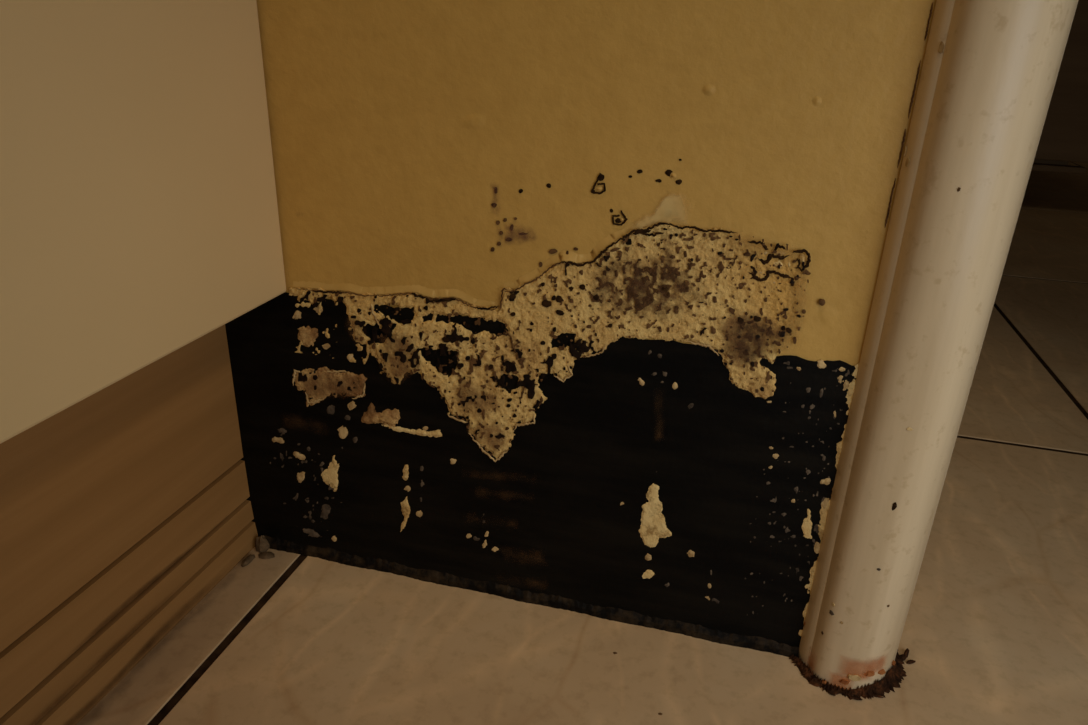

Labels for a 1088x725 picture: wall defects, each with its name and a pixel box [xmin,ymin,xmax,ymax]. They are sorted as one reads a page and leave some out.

damp [490,187,528,252]
damp [637,196,685,227]
damp [596,249,689,313]
peeling [270,222,811,542]
peeling [466,513,499,552]
peeling [639,471,672,579]
peeling [768,360,860,637]
rust [789,648,916,700]